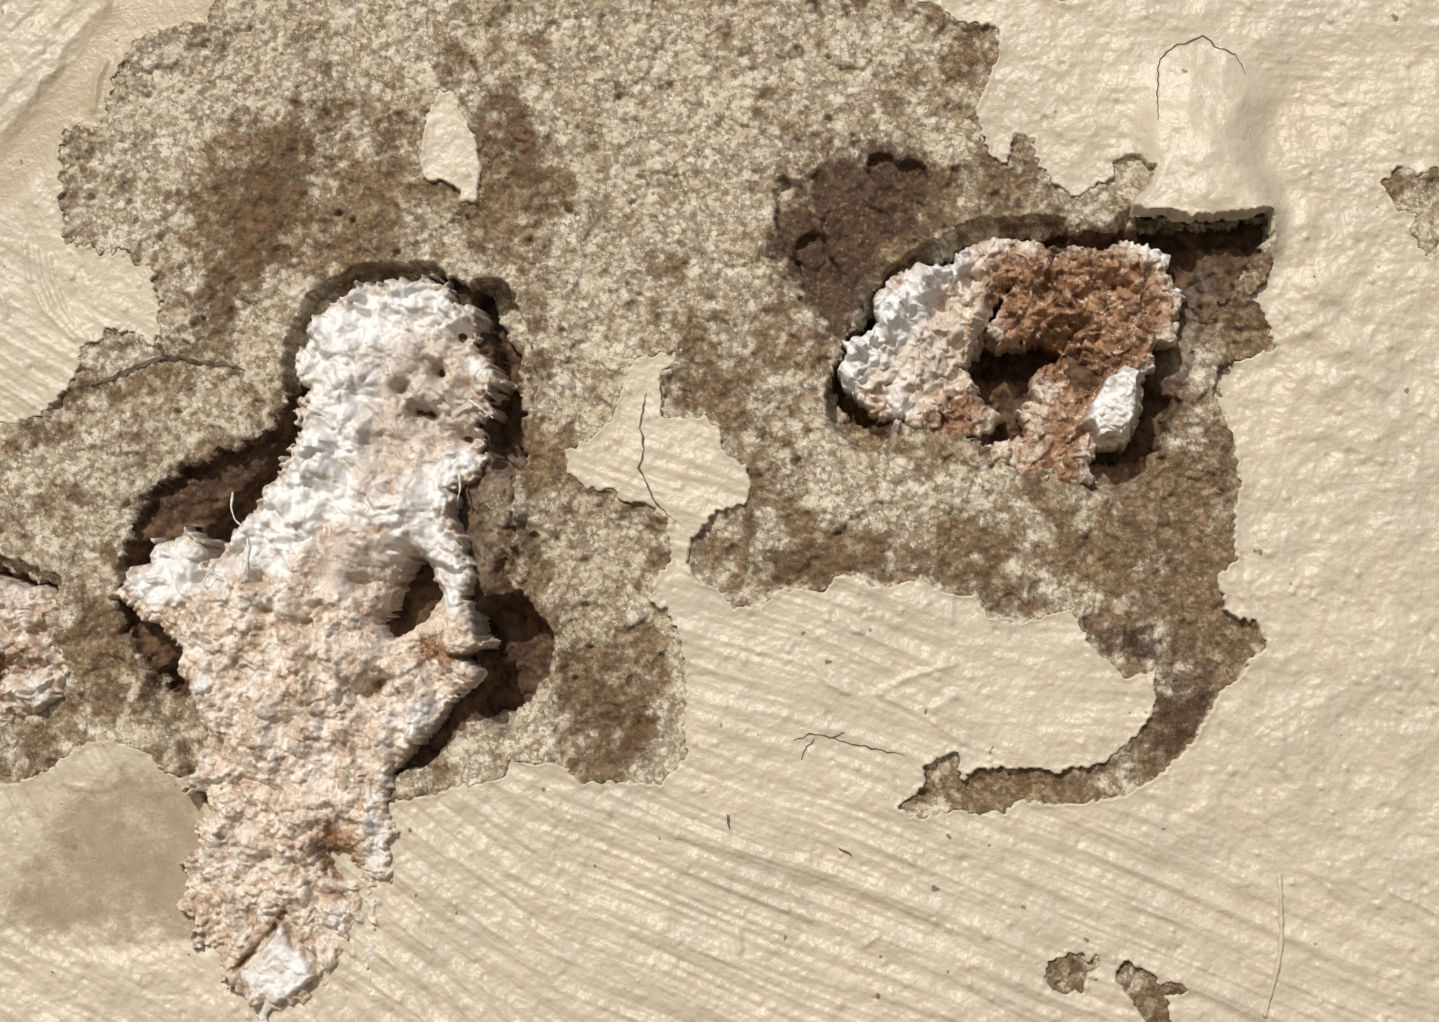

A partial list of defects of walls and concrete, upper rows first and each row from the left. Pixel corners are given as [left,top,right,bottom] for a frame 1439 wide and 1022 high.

crack [1156,35,1246,120]
peeling [1381,167,1439,258]
water stain [762,138,1187,487]
spalling [0,0,1276,819]
water stain [0,574,71,728]
water stain [106,273,518,1022]
peeling [1044,952,1100,994]
peeling [1116,960,1187,1022]